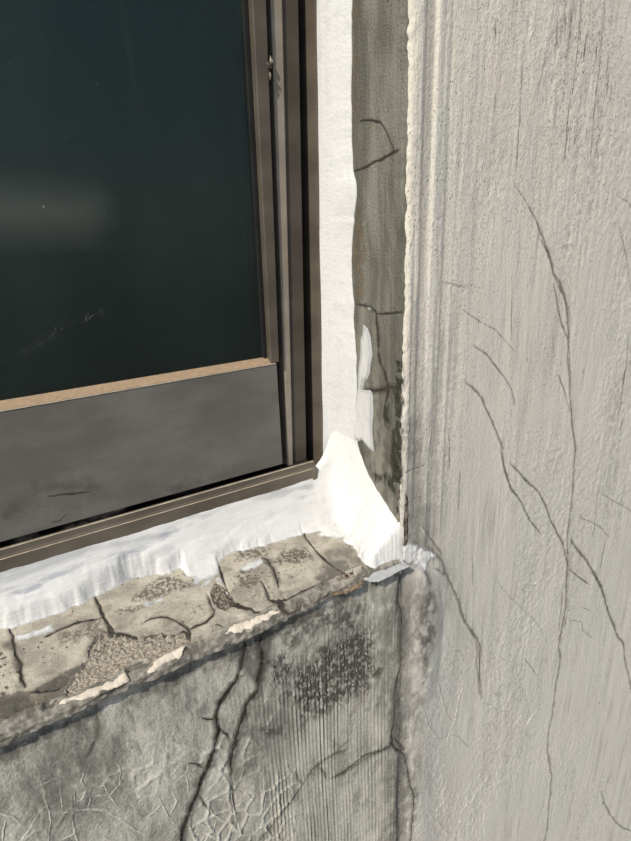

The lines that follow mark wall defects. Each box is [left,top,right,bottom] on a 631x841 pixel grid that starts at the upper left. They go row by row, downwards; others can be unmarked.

peeling [354,325,374,451]
leakage [374,360,404,492]
crack [476,186,631,840]
crack [9,629,58,693]
leakage [28,727,53,744]
spalling [55,633,191,704]
crack [45,557,315,656]
crack [179,633,265,841]
spalling [189,552,311,614]
leakage [212,594,359,681]
leakage [296,633,381,714]
crack [285,576,414,841]